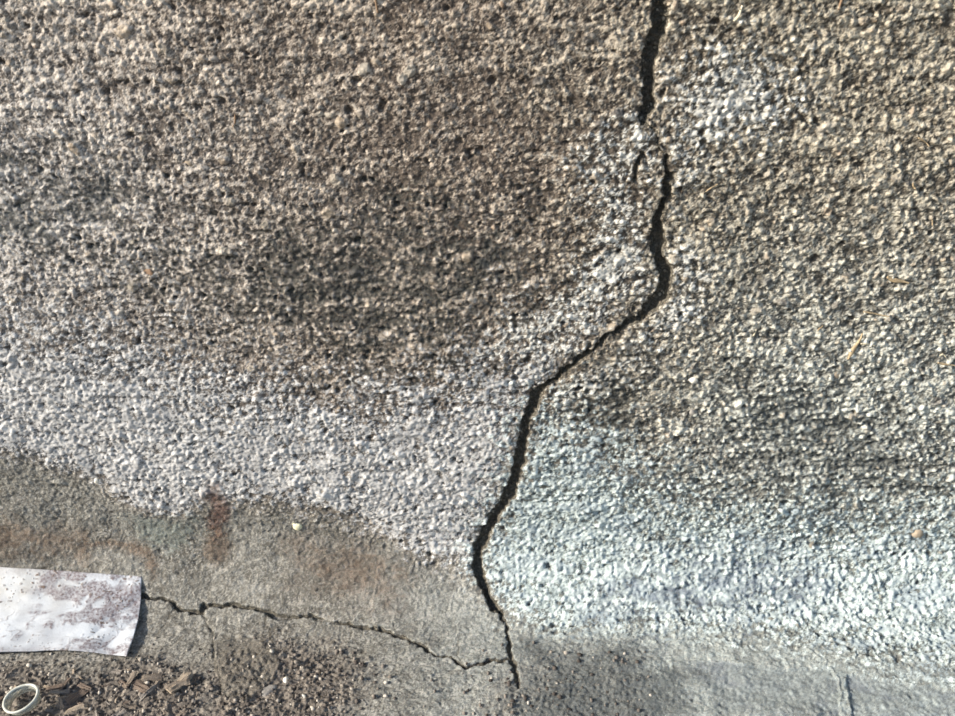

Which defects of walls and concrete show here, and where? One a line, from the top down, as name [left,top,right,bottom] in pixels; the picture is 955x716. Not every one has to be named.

water stain [0,107,663,584]
crack [141,0,674,689]
water stain [482,237,955,716]
water stain [655,35,815,188]